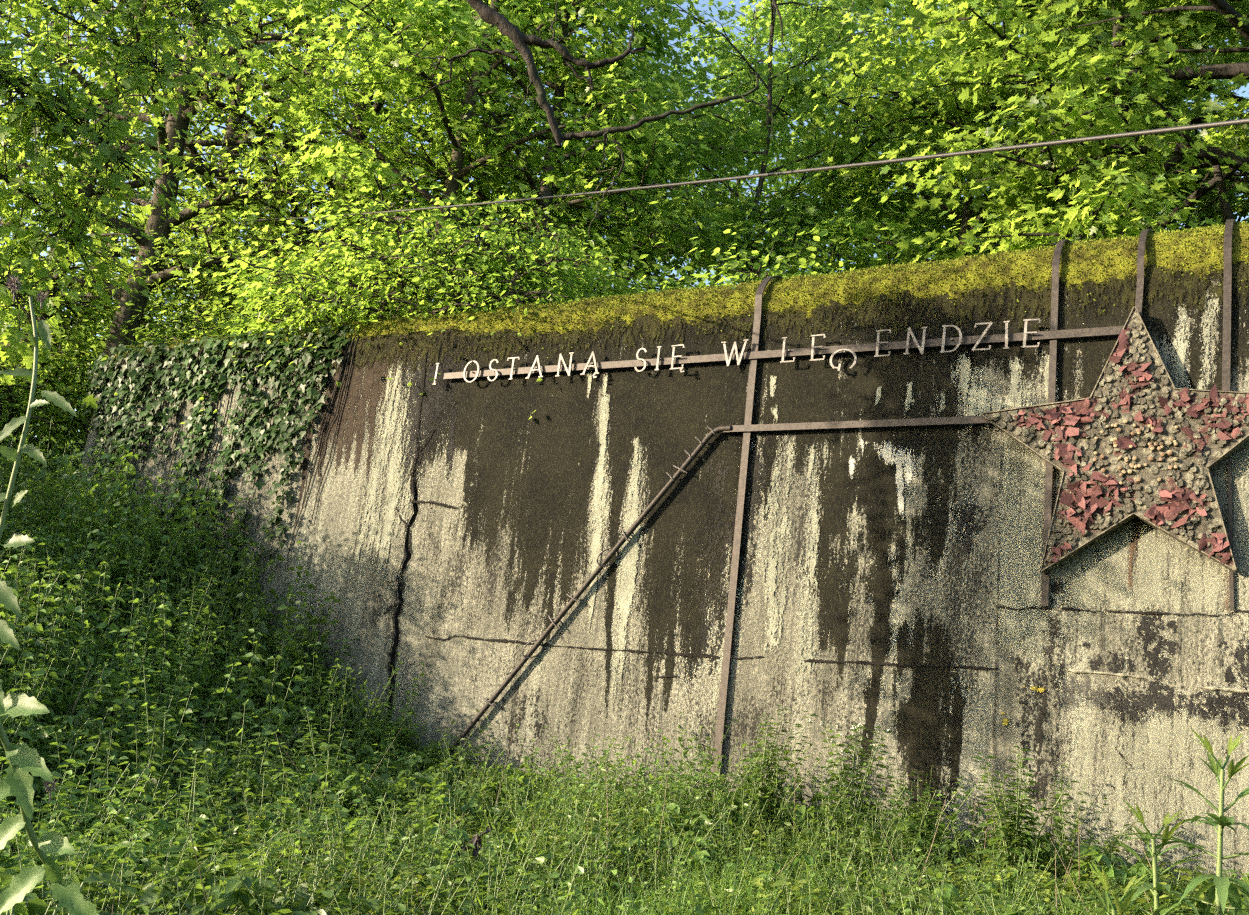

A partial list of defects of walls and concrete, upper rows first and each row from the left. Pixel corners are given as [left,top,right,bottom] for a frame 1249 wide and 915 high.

leakage [293,331,468,581]
leakage [469,490,483,549]
crack [383,335,764,743]
leakage [523,370,851,739]
leakage [849,438,916,519]
leakage [904,381,915,419]
leakage [929,498,992,575]
leakage [935,347,1073,428]
leakage [1168,277,1222,391]
leakage [859,551,909,777]
leakage [908,681,966,837]
leakage [1010,610,1067,811]